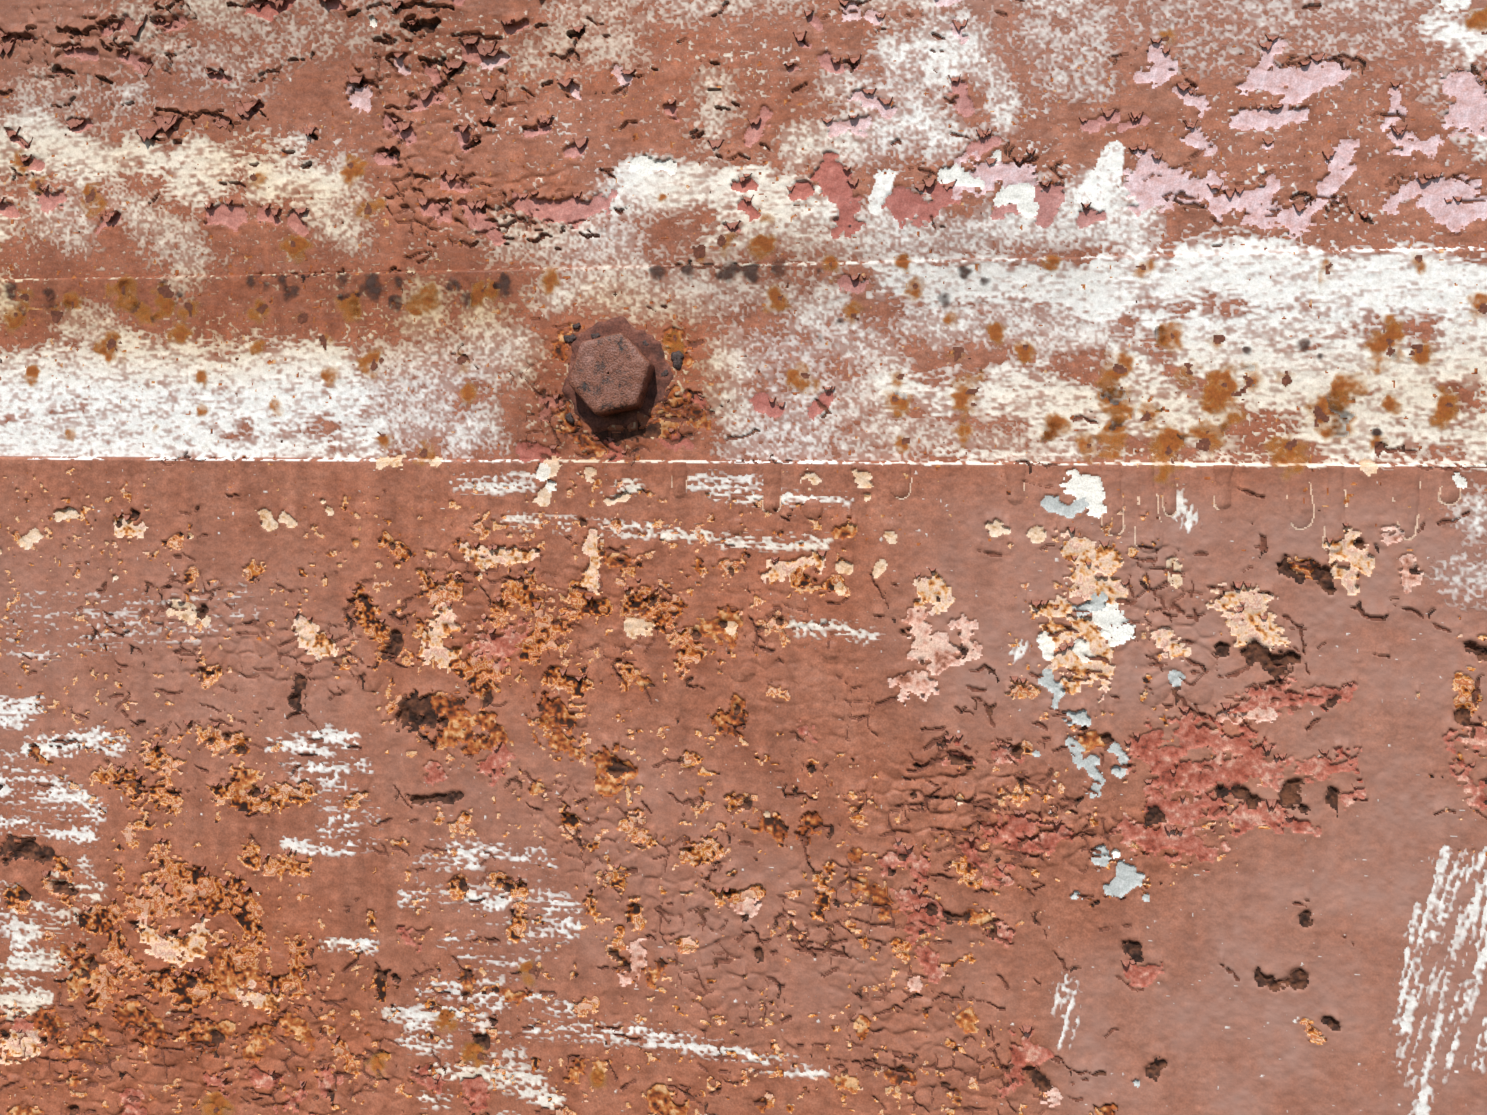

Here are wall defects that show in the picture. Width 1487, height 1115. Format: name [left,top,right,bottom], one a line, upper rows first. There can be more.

rust [298,154,635,426]
peeling [0,0,1487,613]
rust [1041,322,1357,519]
rust [95,720,318,817]
rust [379,506,743,799]
peeling [1037,591,1136,798]
peeling [1168,670,1186,687]
spalling [1230,784,1261,810]
rust [1206,581,1291,653]
spalling [1215,640,1301,683]
spalling [1279,779,1340,818]
rust [0,822,391,1115]